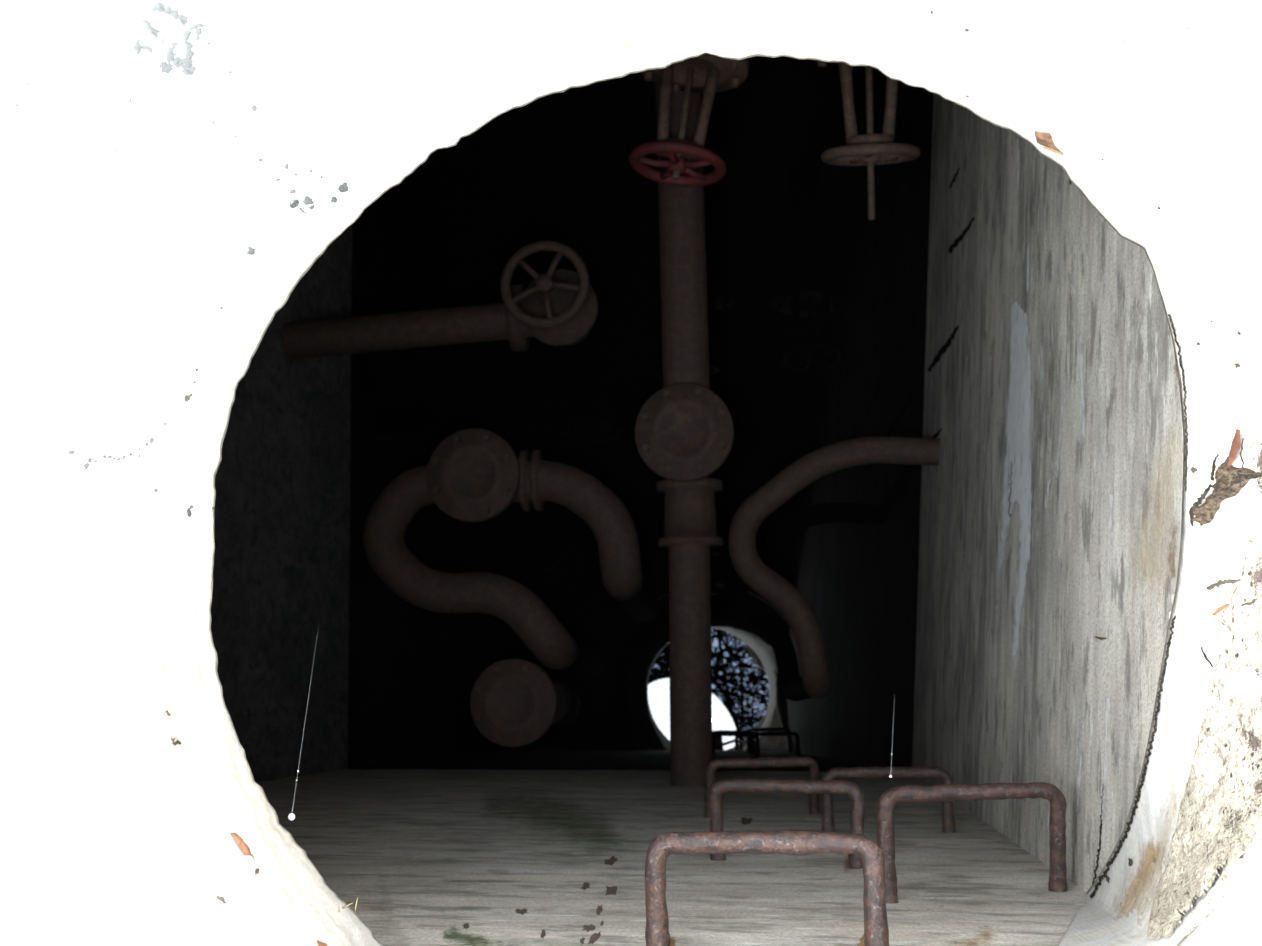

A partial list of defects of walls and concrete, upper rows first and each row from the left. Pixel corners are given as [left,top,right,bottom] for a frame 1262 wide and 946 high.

crack [1090,616,1176,899]
spalling [1146,410,1262,940]
crack [1206,579,1257,606]